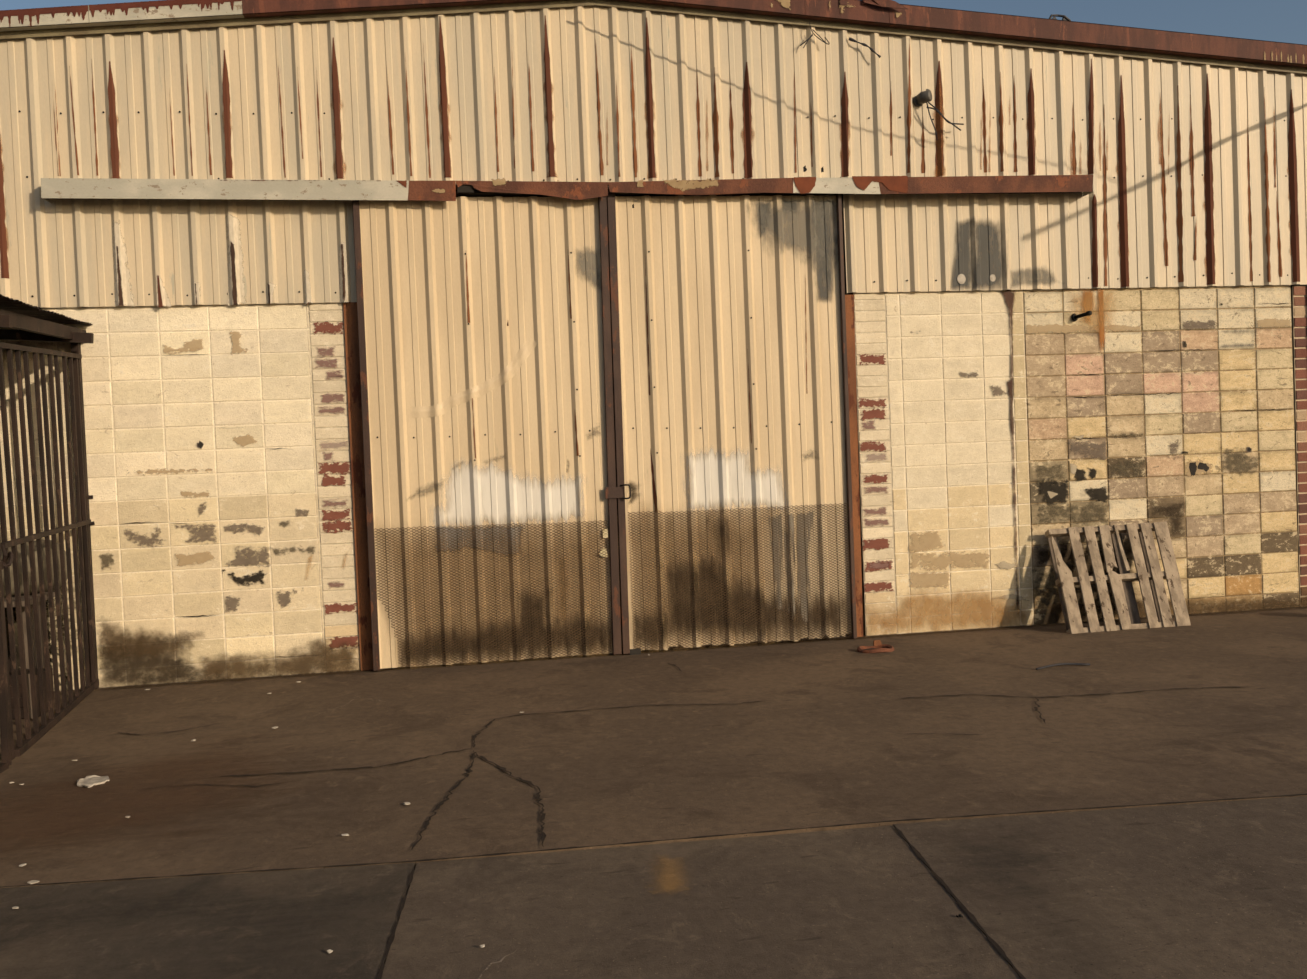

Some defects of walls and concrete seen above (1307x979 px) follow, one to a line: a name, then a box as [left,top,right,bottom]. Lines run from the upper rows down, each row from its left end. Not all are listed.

rust [0,0,242,27]
rust [314,37,346,181]
peeling [318,441,353,533]
peeling [175,551,214,566]
peeling [325,603,357,615]
peeling [329,635,360,649]
water stain [100,624,482,689]